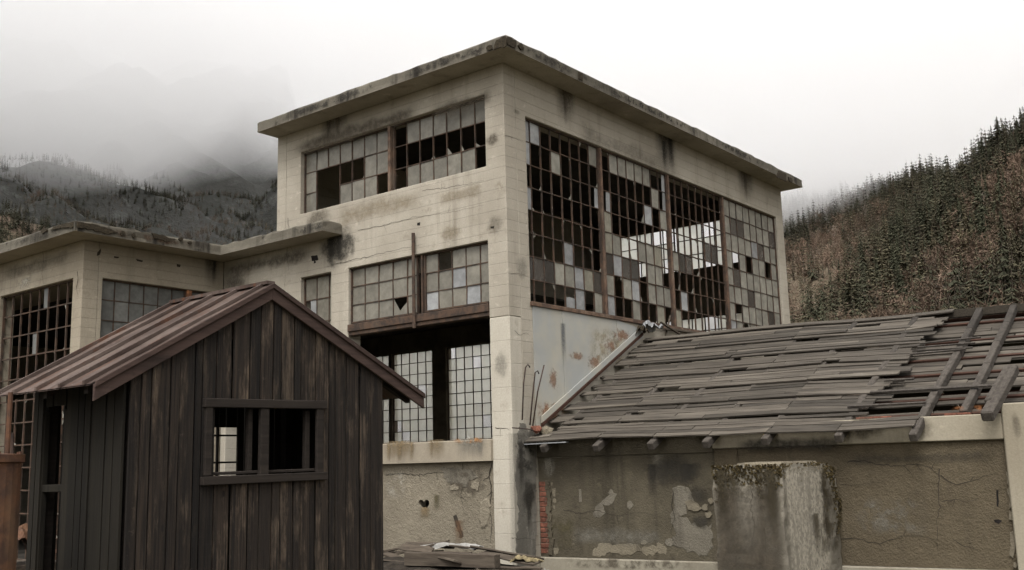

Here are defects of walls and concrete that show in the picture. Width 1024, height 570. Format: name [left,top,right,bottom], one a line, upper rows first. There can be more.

leakage [322,234,353,265]
flaking render [539,480,559,556]
flaking render [592,485,714,557]
leakage [765,469,839,570]
crack [843,460,996,549]